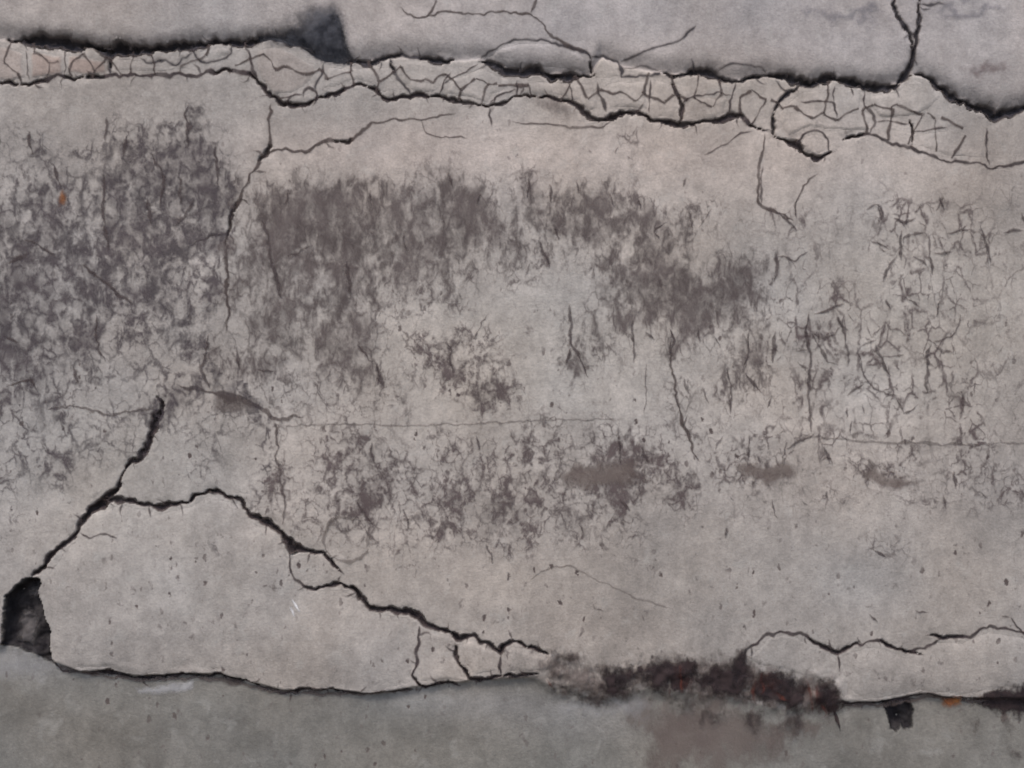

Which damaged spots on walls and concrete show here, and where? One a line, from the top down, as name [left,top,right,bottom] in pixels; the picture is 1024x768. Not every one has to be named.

crack [0,0,1024,329]
leakage [0,107,990,488]
leakage [256,464,289,512]
crack [33,386,546,698]
leakage [304,417,700,559]
leakage [946,393,1024,505]
spalling [1,578,57,663]
crack [744,618,1024,670]
spalling [539,649,843,768]
spalling [883,698,914,731]